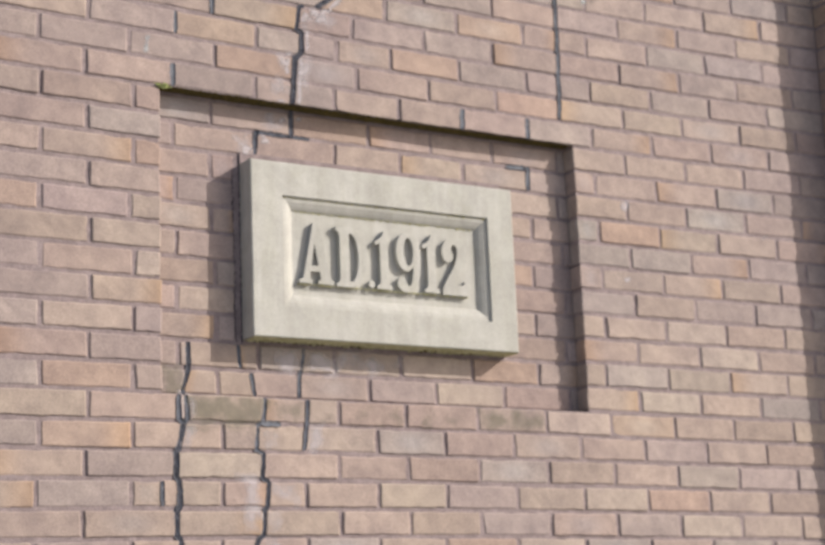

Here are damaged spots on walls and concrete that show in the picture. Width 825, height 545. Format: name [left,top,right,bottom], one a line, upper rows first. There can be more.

crack [168,63,176,86]
crack [171,10,179,33]
crack [208,0,216,14]
crack [553,0,562,120]
crack [231,0,341,545]
crack [160,342,191,545]